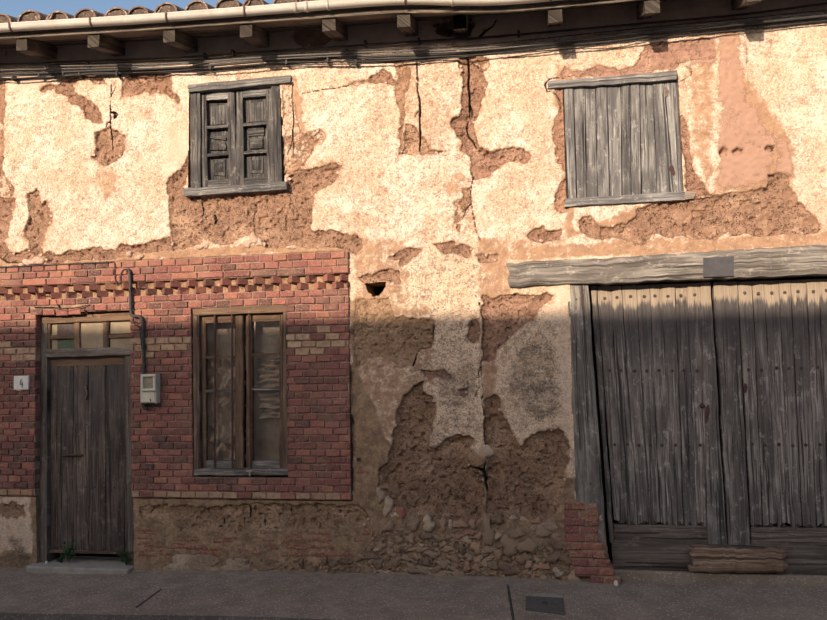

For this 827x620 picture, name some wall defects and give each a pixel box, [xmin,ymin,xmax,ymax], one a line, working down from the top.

crack [106,84,119,149]
spalling [0,73,362,264]
crack [414,59,422,152]
crack [466,57,477,149]
spalling [451,53,531,180]
spalling [560,29,821,246]
spalling [359,248,421,286]
spalling [435,241,499,263]
spalling [352,297,434,368]
spalling [467,293,555,362]
crack [472,302,488,490]
spalling [378,370,570,523]